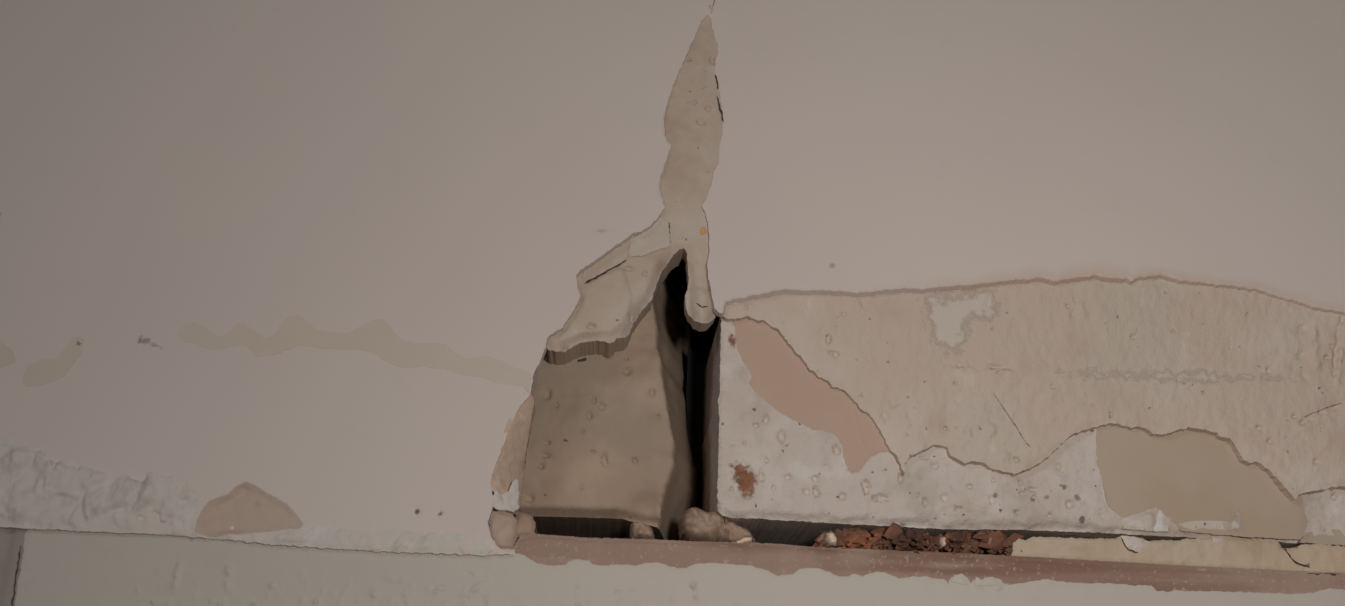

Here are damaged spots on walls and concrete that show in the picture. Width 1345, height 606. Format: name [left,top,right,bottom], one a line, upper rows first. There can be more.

spalling [195,482,303,537]
spalling [489,4,1345,594]